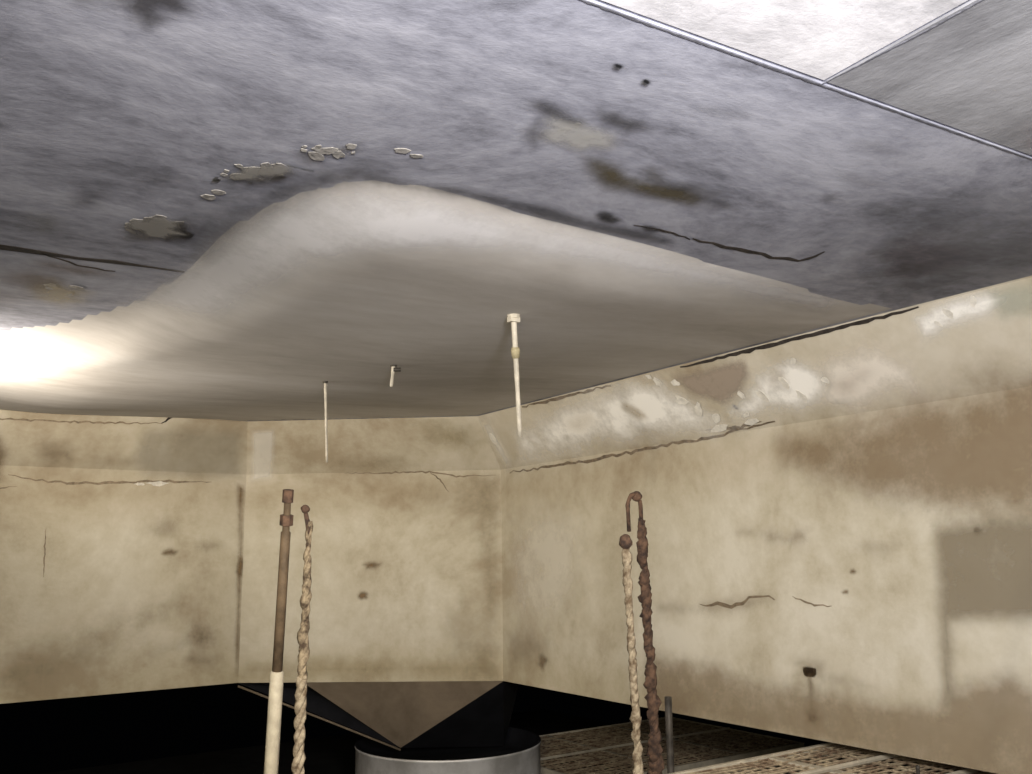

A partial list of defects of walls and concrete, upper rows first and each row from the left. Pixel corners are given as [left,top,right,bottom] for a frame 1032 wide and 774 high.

water stain [130,0,184,21]
spalling [301,144,357,161]
spalling [220,162,288,181]
spalling [125,215,184,239]
crack [634,225,824,262]
crack [0,244,185,273]
peeling [520,351,914,454]
crack [349,418,775,492]
crack [0,474,208,489]
crack [700,595,831,609]